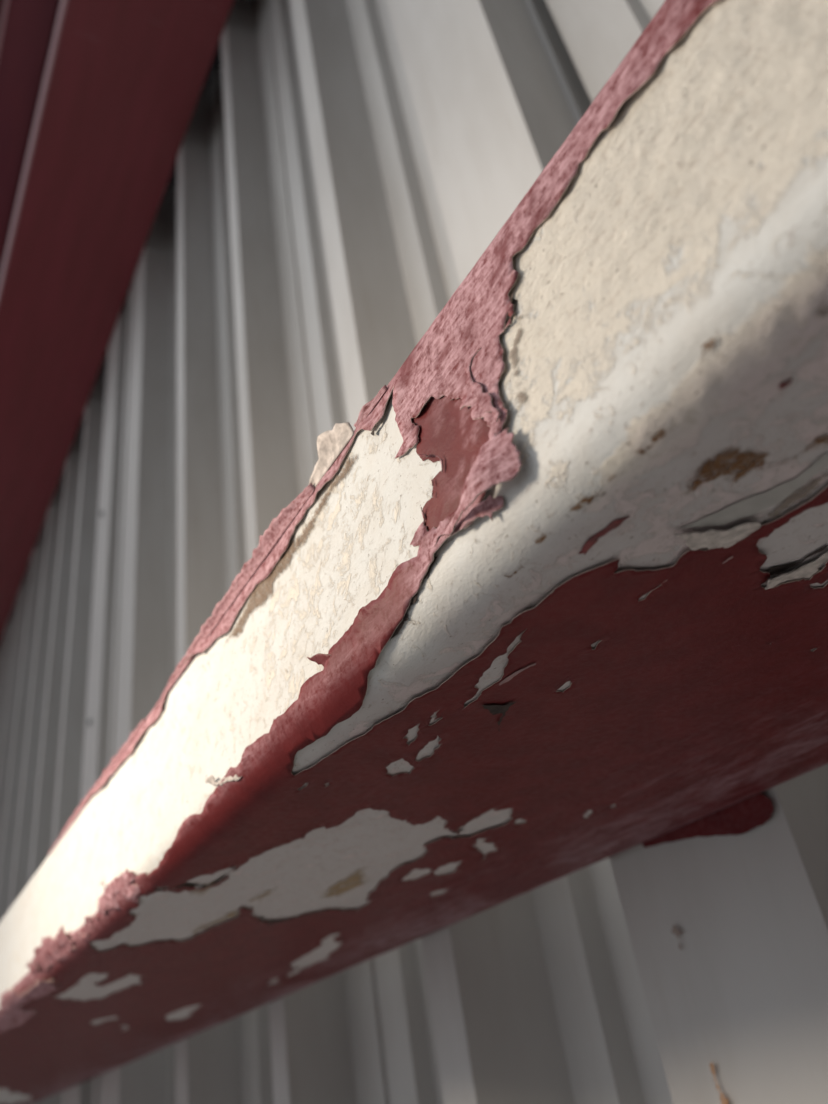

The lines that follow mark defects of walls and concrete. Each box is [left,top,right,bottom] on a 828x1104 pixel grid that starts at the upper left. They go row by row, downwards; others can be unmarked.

peeling [0,398,512,1032]
peeling [292,0,828,776]
rust [681,447,782,496]
peeling [0,1088,32,1104]